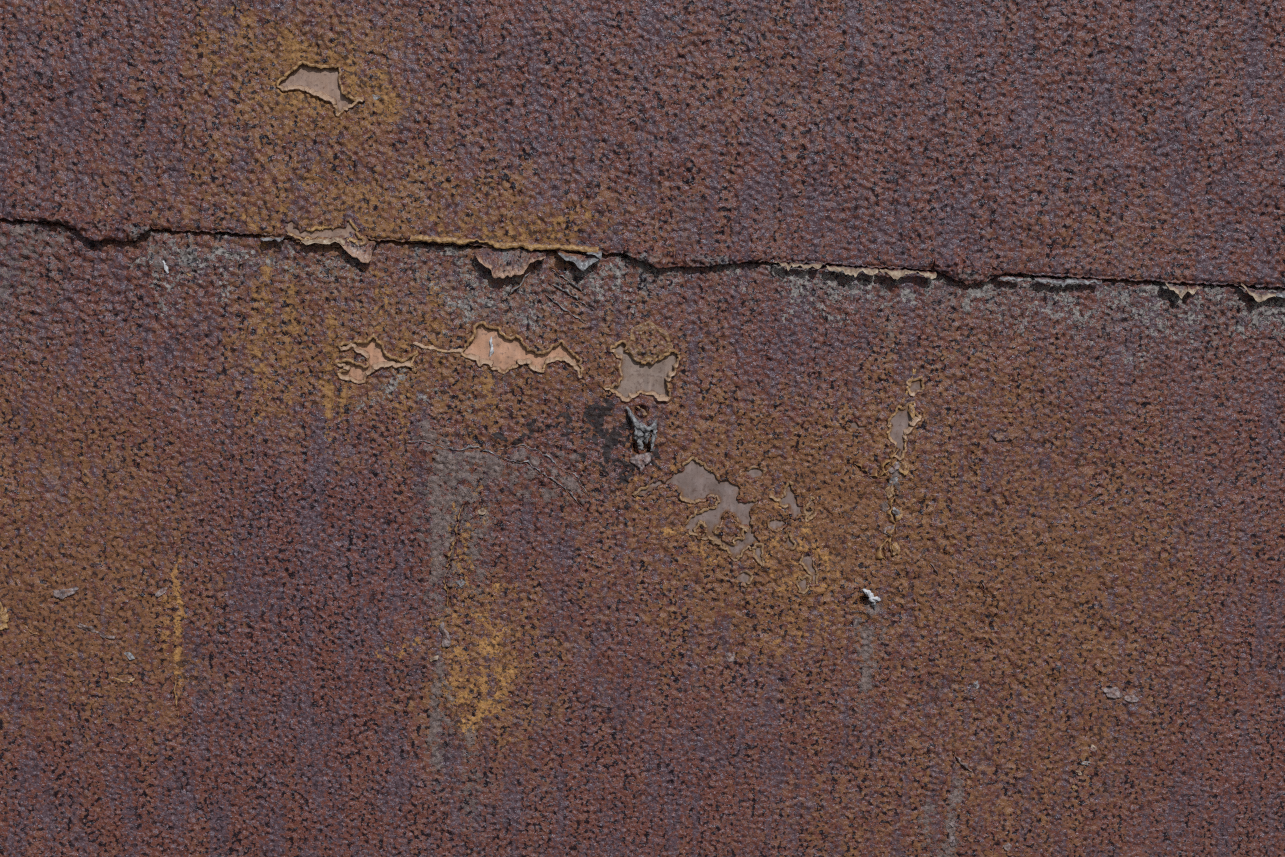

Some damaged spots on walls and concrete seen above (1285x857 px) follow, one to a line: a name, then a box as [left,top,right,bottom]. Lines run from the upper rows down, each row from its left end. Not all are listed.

peeling [275,59,380,118]
peeling [270,214,368,247]
rust [193,2,621,476]
rust [774,261,937,280]
rust [999,276,1102,287]
rust [1164,281,1203,299]
rust [1241,283,1285,303]
peeling [332,320,588,385]
peeling [601,321,683,416]
peeling [630,452,820,594]
rust [151,556,187,711]
rust [375,483,563,751]